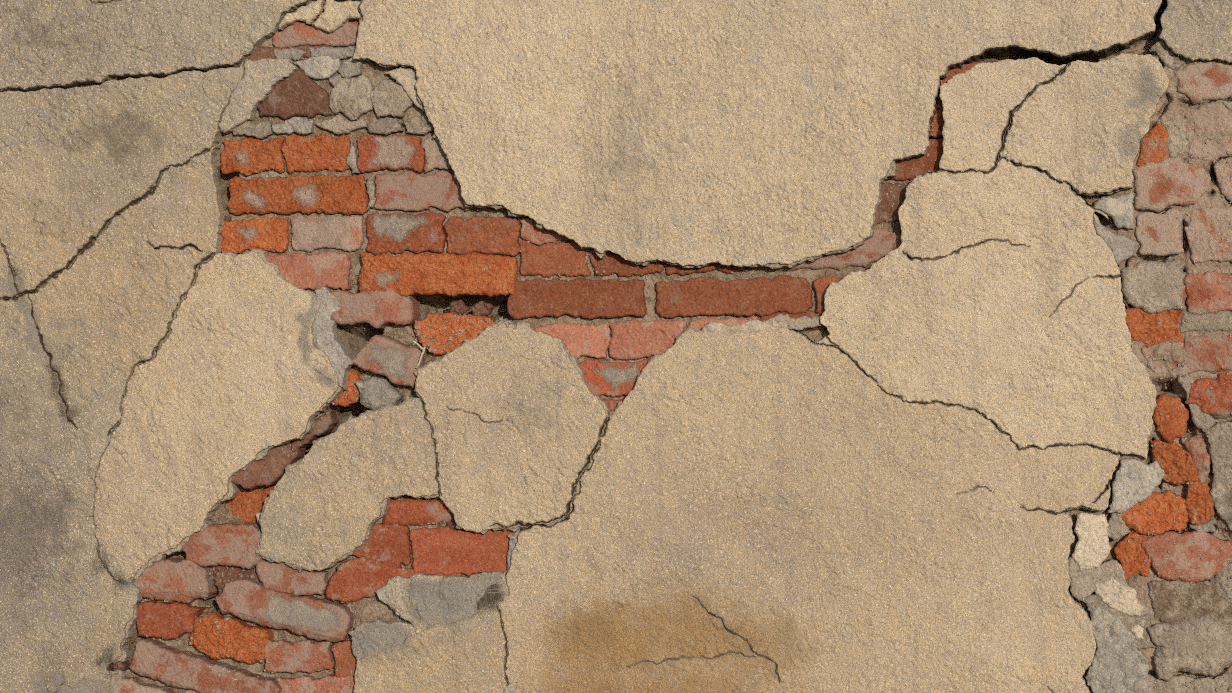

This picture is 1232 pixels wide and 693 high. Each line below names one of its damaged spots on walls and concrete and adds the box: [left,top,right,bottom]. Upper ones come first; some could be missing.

crack [0,64,241,92]
spalling [218,58,299,134]
crack [922,0,1168,232]
crack [0,148,209,429]
spalling [299,287,355,390]
spalling [694,314,824,335]
crack [902,238,1030,262]
peeling [1093,192,1136,265]
crack [92,241,215,585]
crack [788,326,1122,515]
peeling [348,529,525,662]
spalling [1068,458,1190,693]